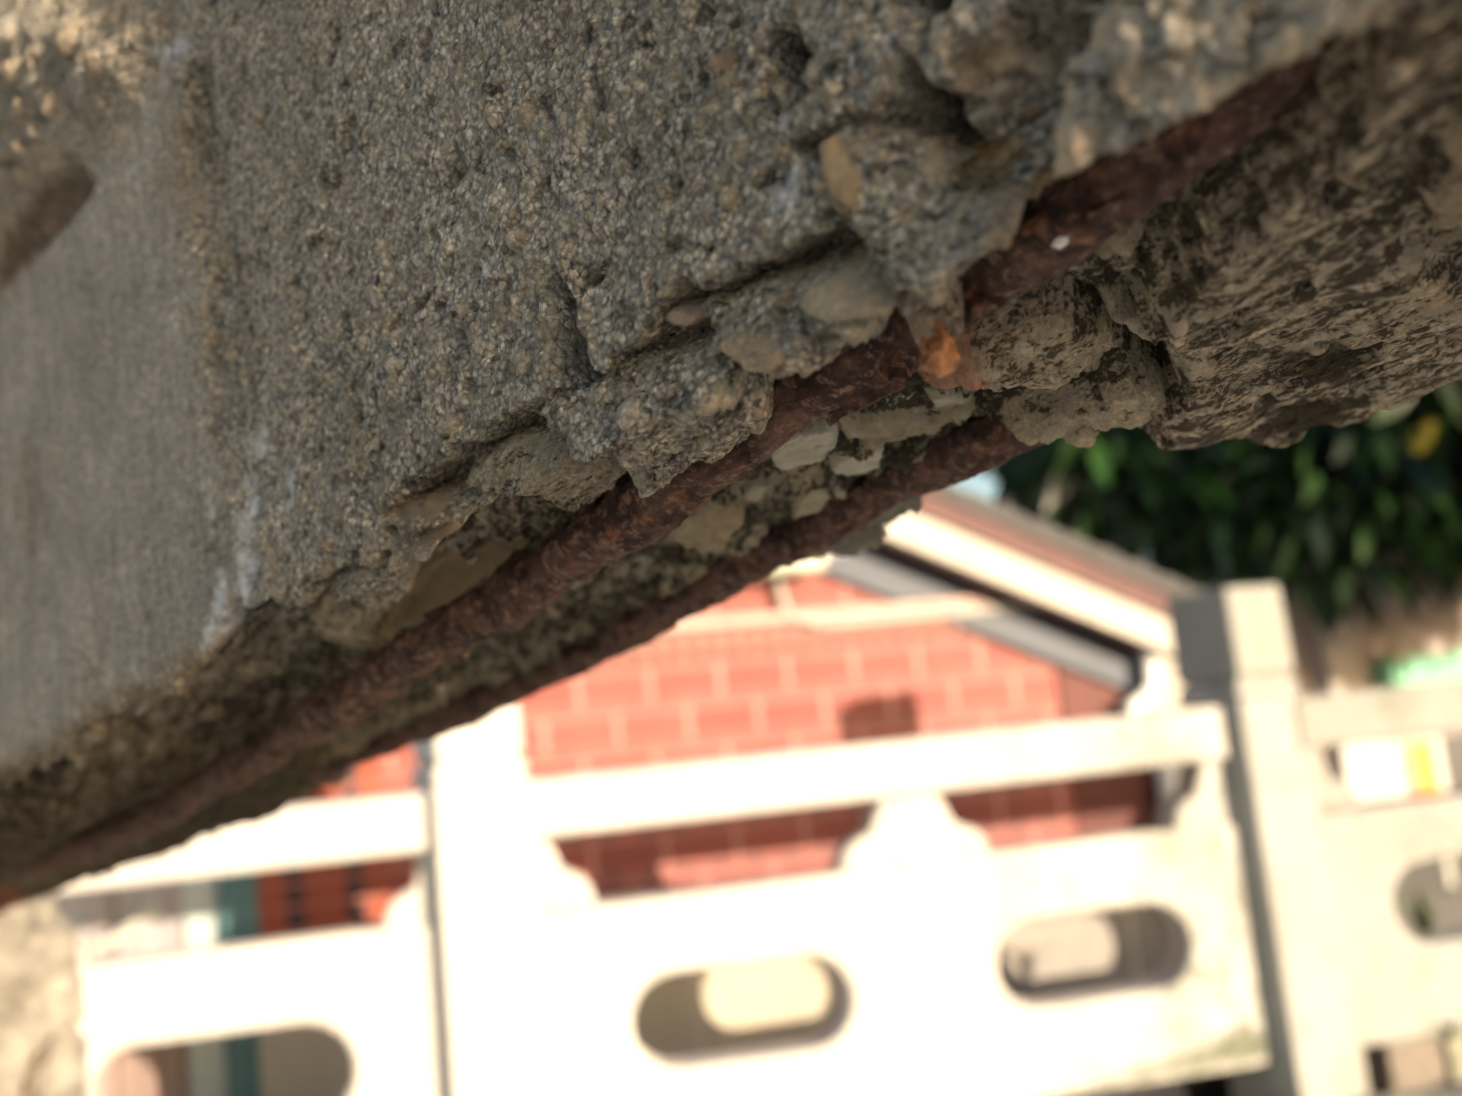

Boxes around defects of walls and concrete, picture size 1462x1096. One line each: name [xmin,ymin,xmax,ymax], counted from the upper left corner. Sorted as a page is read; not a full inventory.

rust [0,48,1319,915]
spalling [0,0,1415,899]